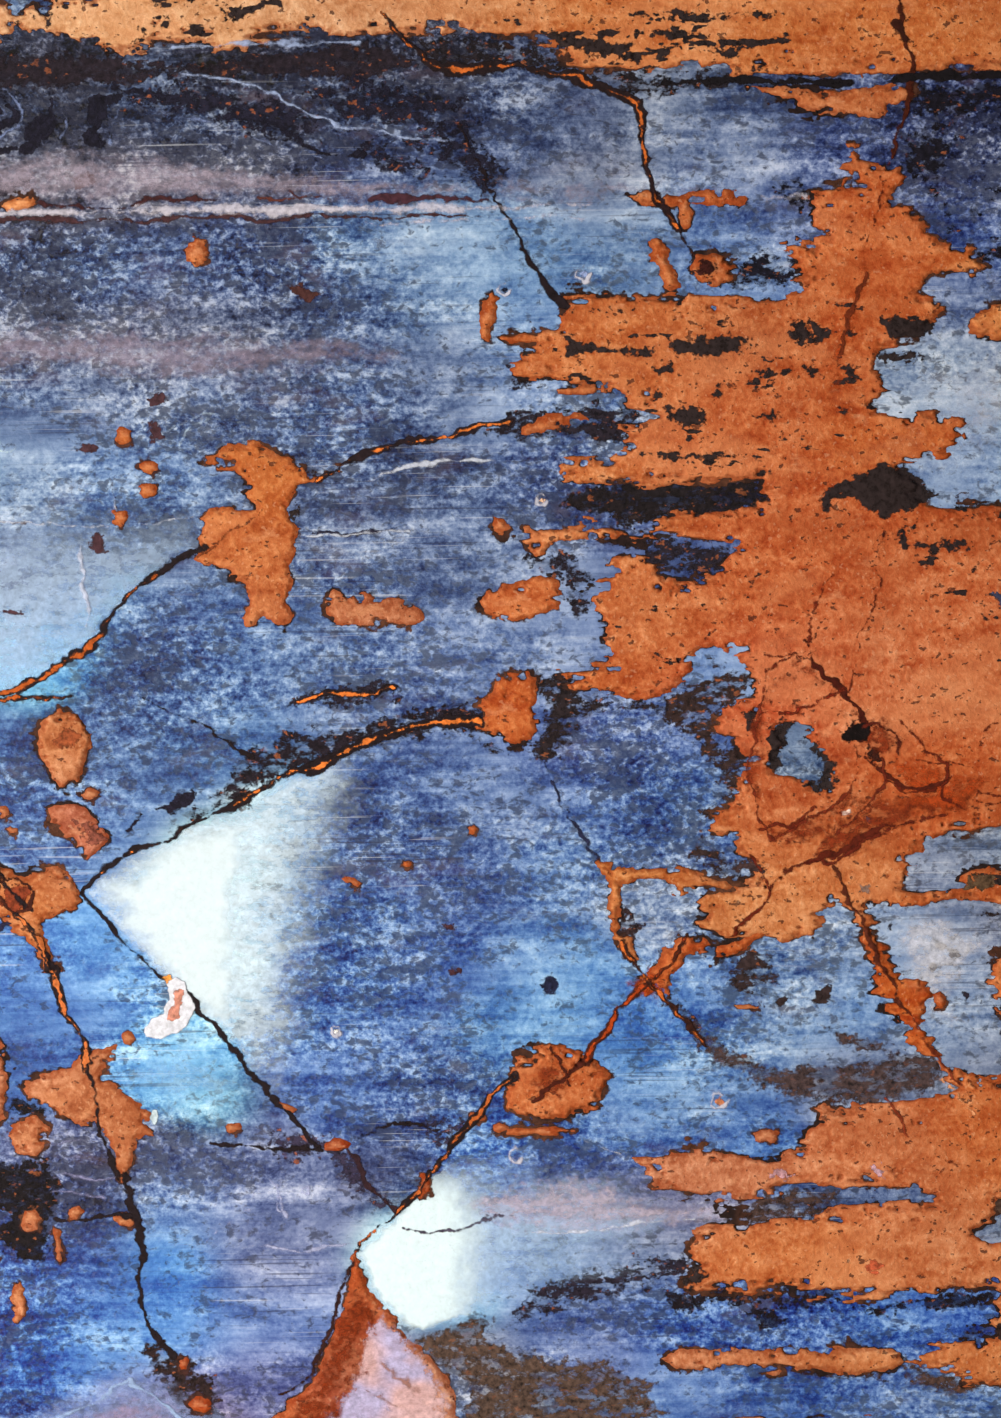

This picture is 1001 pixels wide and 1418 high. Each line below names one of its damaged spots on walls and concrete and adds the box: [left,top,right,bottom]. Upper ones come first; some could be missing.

crack [0,123,570,310]
peeling [0,0,1001,122]
crack [380,11,854,257]
crack [838,0,1001,356]
crack [0,512,260,703]
peeling [194,439,343,633]
peeling [467,140,1001,1388]
crack [0,872,177,1360]
peeling [0,975,195,1185]
crack [80,697,707,1395]
peeling [176,1353,212,1416]
peeling [272,1249,459,1418]